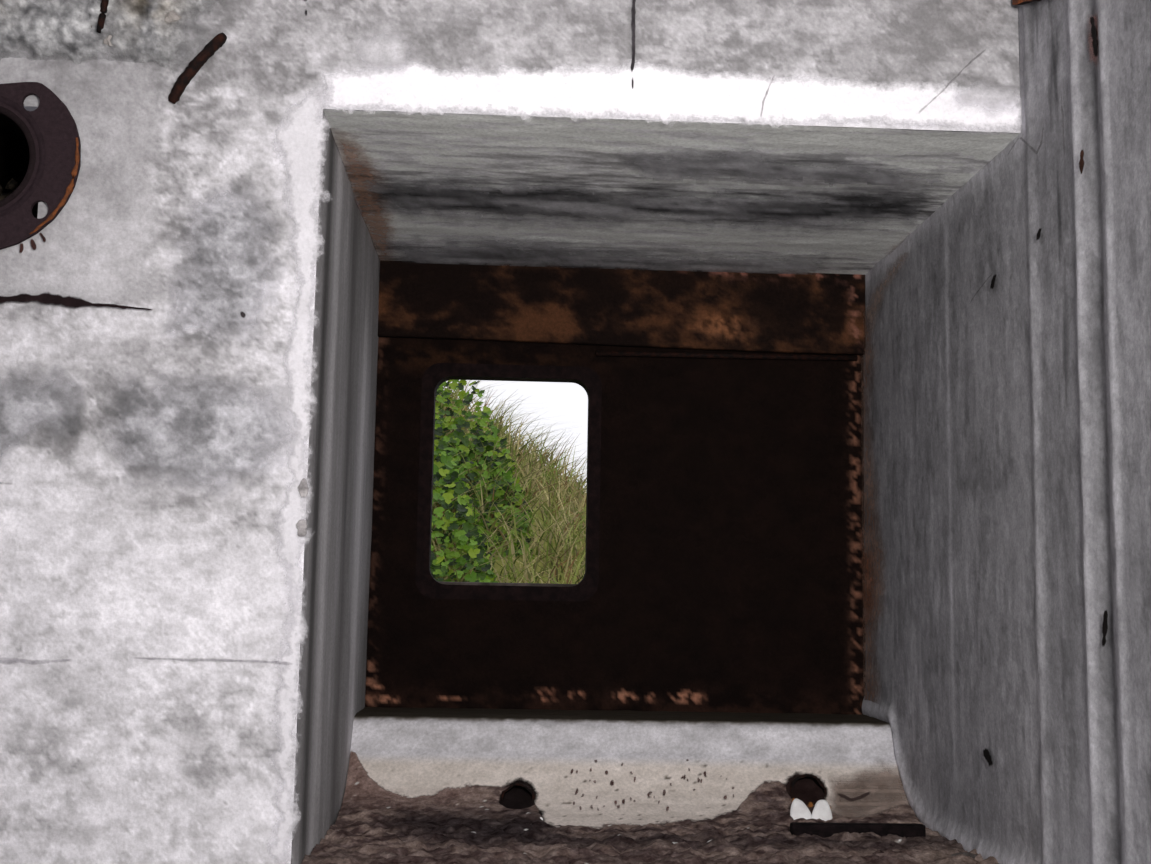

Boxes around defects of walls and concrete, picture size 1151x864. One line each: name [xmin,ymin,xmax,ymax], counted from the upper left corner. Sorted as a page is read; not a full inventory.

crack [629,0,637,88]
rust [20,137,80,253]
crack [0,293,152,310]